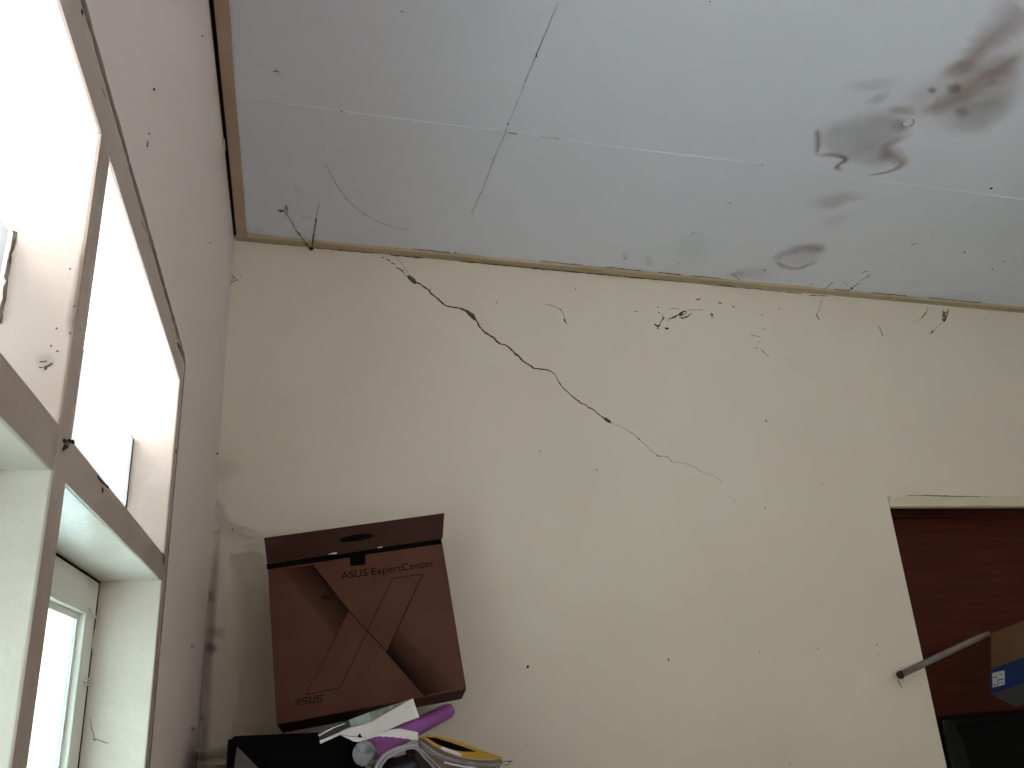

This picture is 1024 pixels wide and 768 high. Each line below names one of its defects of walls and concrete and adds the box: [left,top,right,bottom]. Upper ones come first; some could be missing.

crack [317,163,906,477]